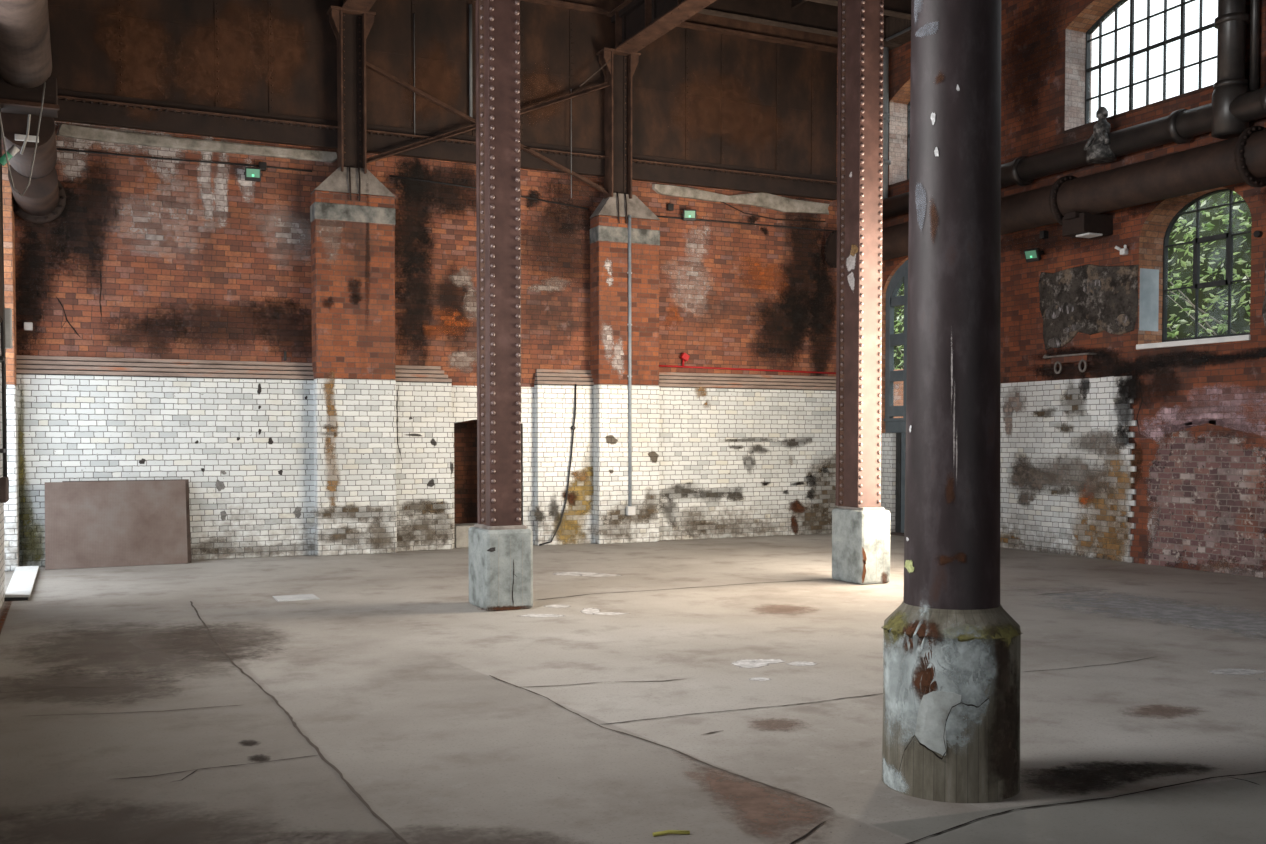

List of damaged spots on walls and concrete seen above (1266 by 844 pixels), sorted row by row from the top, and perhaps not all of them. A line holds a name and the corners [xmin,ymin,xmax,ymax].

damp [197,137,252,226]
damp [16,234,42,355]
damp [1035,352,1157,403]
corrosion [323,373,339,506]
damp [534,467,744,544]
damp [726,438,812,471]
damp [783,454,836,534]
damp [1034,386,1266,561]
spalling [1144,429,1266,574]
corrosion [901,620,942,700]
crack [20,601,408,844]
peeling [915,691,961,756]